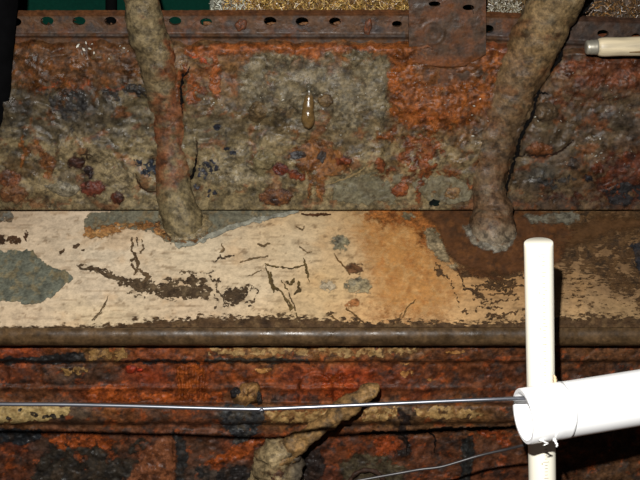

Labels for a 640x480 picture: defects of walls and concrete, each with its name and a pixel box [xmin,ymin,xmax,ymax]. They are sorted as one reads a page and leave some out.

rust [12,39,139,110]
crack [179,66,190,113]
crack [505,0,591,194]
rust [67,156,124,205]
crack [190,140,198,180]
rust [175,41,640,280]
peeling [0,230,73,305]
peeling [77,263,150,298]
peeling [2,270,525,328]
water stain [344,263,372,307]
water stain [434,262,525,321]
peeling [523,210,640,328]